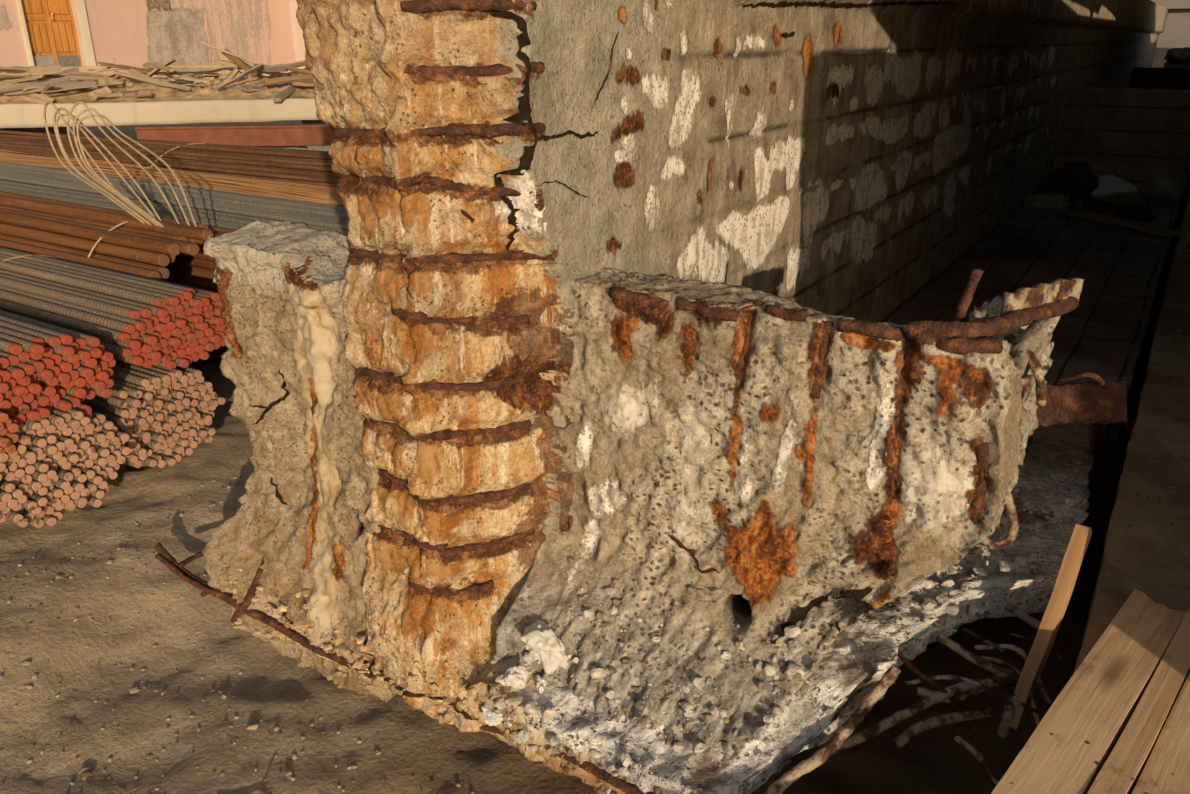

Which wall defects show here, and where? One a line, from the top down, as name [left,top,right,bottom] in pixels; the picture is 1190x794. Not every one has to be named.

crack [738,0,959,38]
crack [490,10,619,250]
leakage [641,30,702,231]
efflorescence [676,45,1057,291]
corrosion [348,247,575,644]
efflorescence [575,378,663,470]
corrosion [610,283,801,612]
spalling [608,286,1004,399]
corrosion [794,316,994,609]
spalling [154,543,382,683]
crack [770,587,873,644]
spalling [763,603,1058,794]